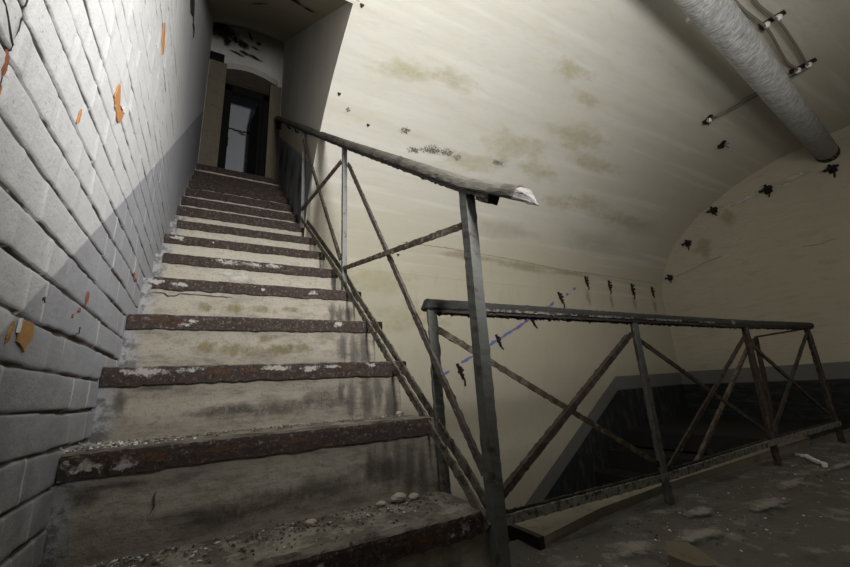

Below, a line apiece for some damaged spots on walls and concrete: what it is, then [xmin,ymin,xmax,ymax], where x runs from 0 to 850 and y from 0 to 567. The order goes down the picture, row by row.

flaking render [213,23,261,61]
peeling [0,49,10,95]
peeling [114,83,126,122]
leakage [407,144,460,161]
crack [154,291,233,299]
peeling [4,318,34,353]
leakage [341,338,368,360]
leakage [363,384,395,416]